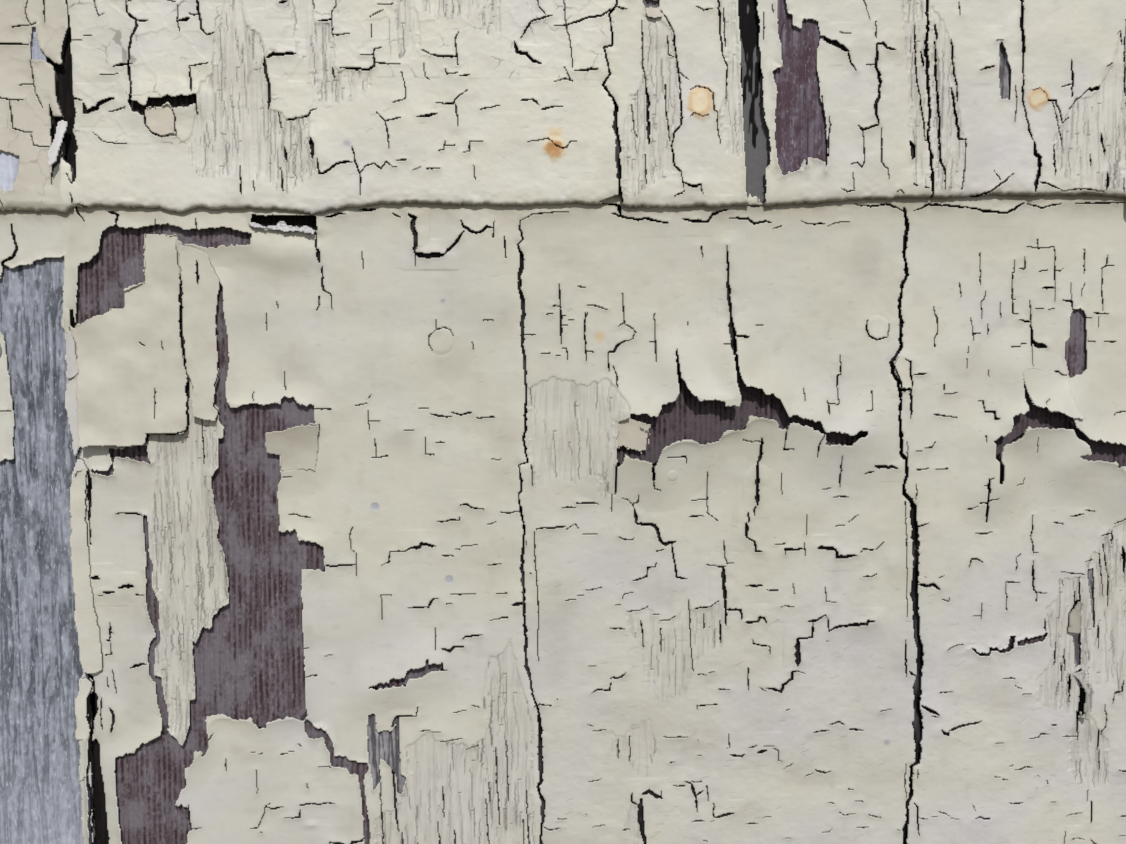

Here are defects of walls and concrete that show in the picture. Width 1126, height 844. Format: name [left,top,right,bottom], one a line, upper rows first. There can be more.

rust [538,132,571,163]
crack [240,0,1126,355]
rust [683,81,718,123]
peeling [718,0,830,207]
rust [1023,83,1053,113]
crack [959,239,1116,376]
peeling [528,369,861,503]
peeling [994,308,1126,468]
peeling [0,214,536,844]
crack [314,359,1000,711]
peeling [972,519,1126,790]
crack [329,705,755,844]